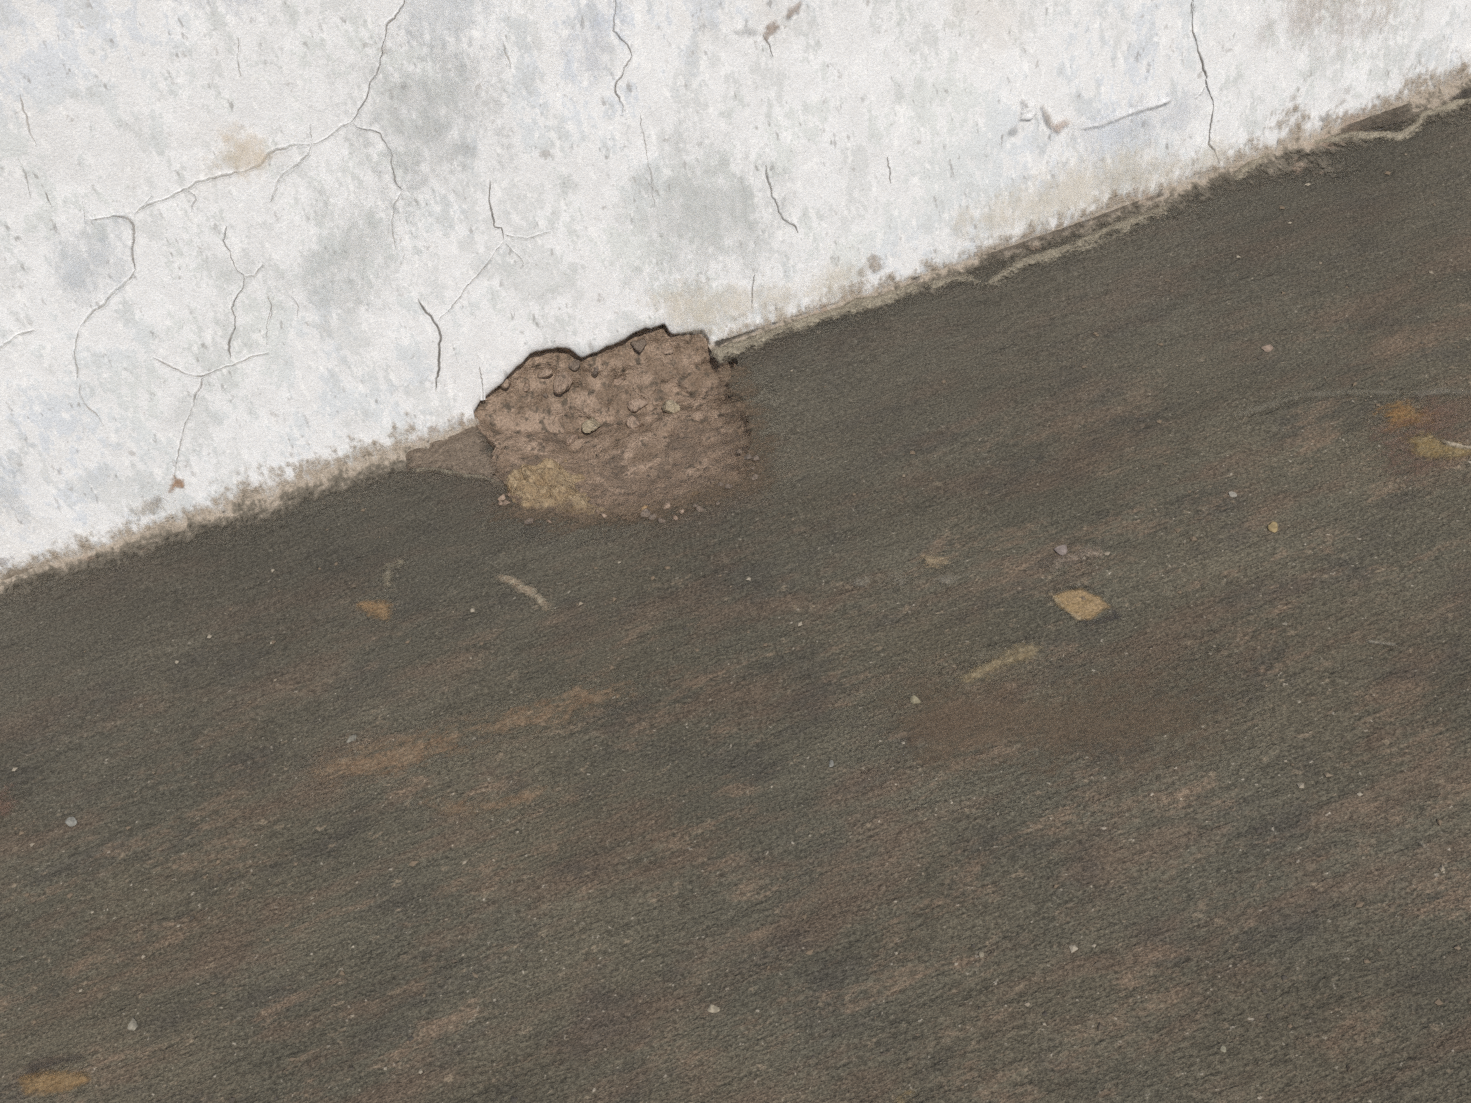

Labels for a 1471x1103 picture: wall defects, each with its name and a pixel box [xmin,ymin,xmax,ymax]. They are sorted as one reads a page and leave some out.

crack [610,0,657,206]
crack [1187,0,1223,167]
crack [0,328,36,351]
crack [16,0,407,479]
crack [416,180,551,400]